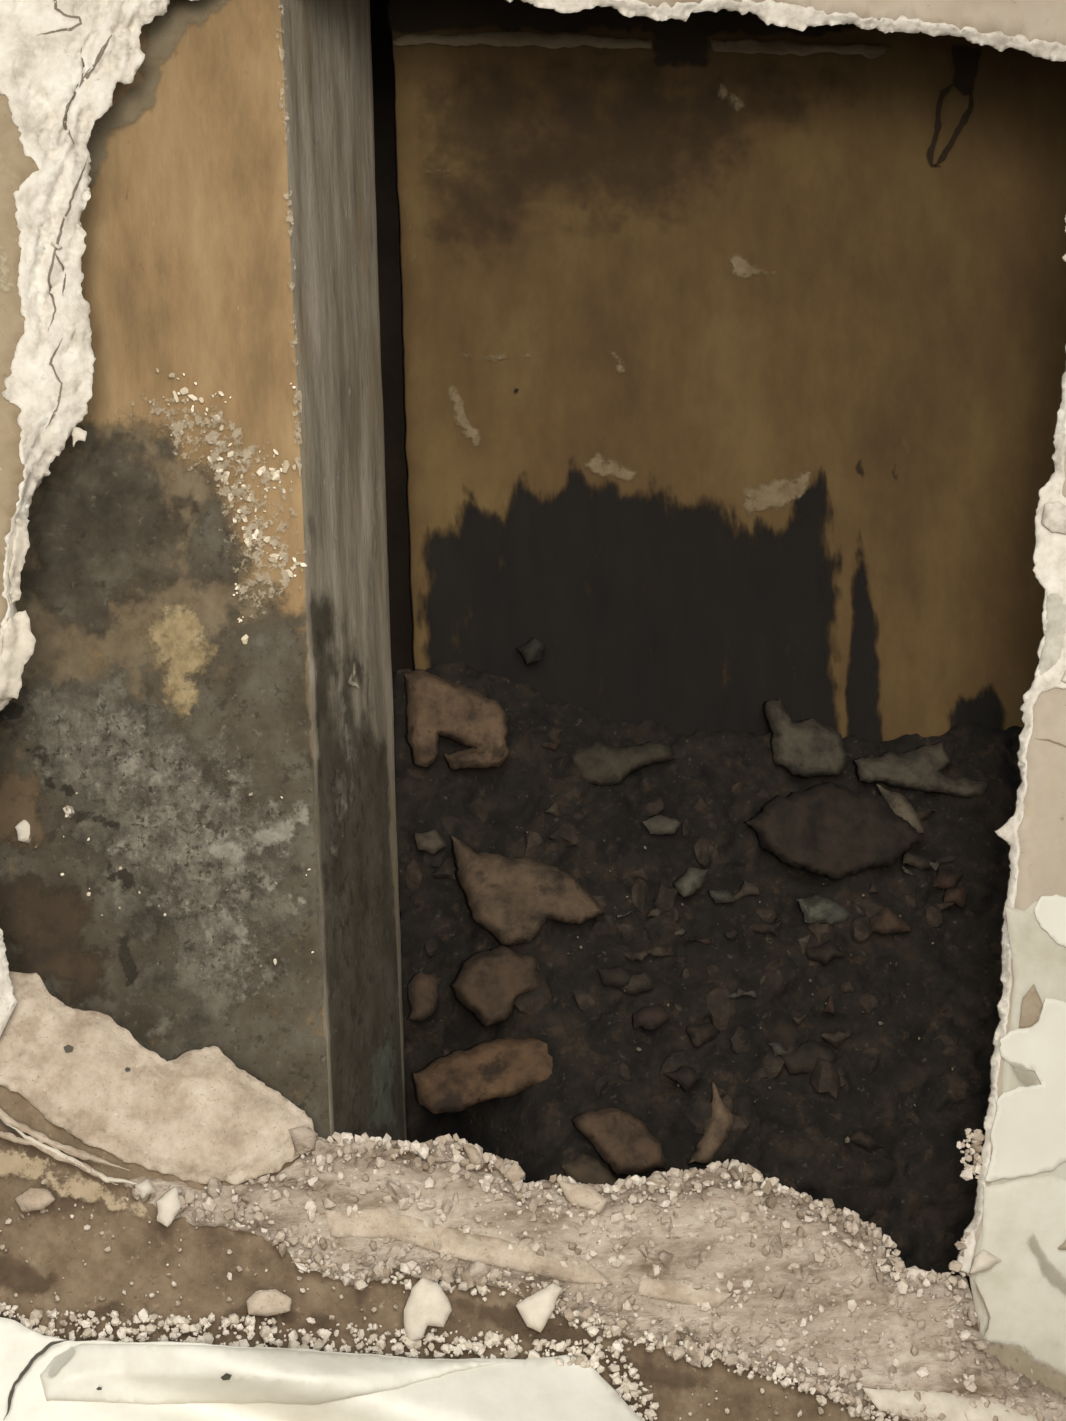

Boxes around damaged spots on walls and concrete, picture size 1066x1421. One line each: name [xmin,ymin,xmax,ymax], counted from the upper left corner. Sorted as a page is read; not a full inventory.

damp [387,0,856,67]
spalling [506,0,1066,61]
crack [37,0,112,428]
spalling [0,0,170,711]
peeling [730,256,760,279]
damp [0,368,405,1141]
spalling [0,344,1066,1421]
damp [418,469,882,741]
damp [950,685,1004,729]